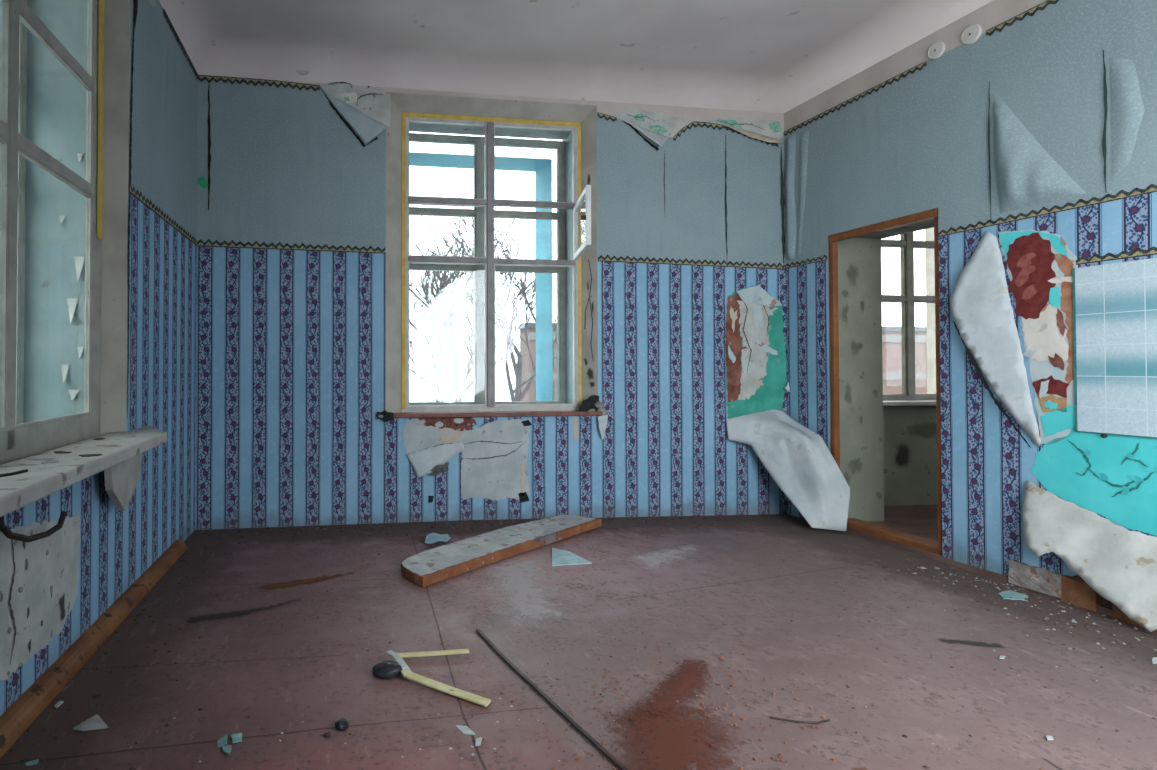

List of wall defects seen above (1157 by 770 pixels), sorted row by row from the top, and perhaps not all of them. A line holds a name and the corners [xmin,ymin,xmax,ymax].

flaking render [320,82,391,147]
flaking render [376,410,532,503]
peeling [725,285,850,531]
peeling [950,229,1157,632]
crack [1068,440,1155,497]
flaking render [0,514,81,681]